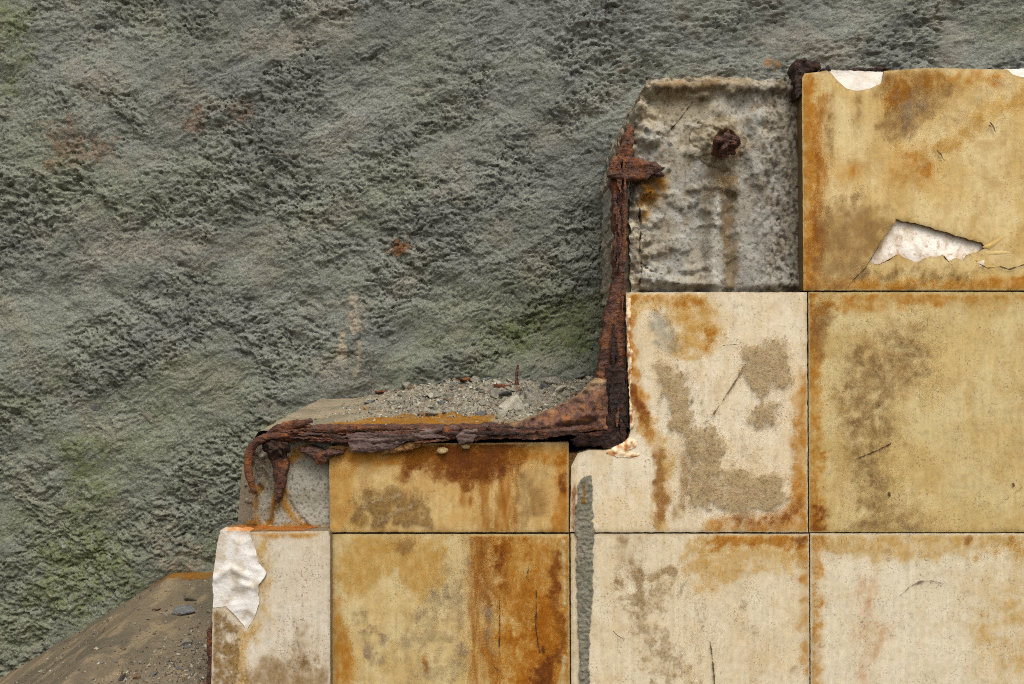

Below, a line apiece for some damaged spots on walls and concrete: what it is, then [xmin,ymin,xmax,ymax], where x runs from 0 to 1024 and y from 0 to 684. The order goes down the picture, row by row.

spalling [829,70,883,91]
spalling [869,220,1011,267]
rust [244,123,666,504]
spalling [212,527,267,630]